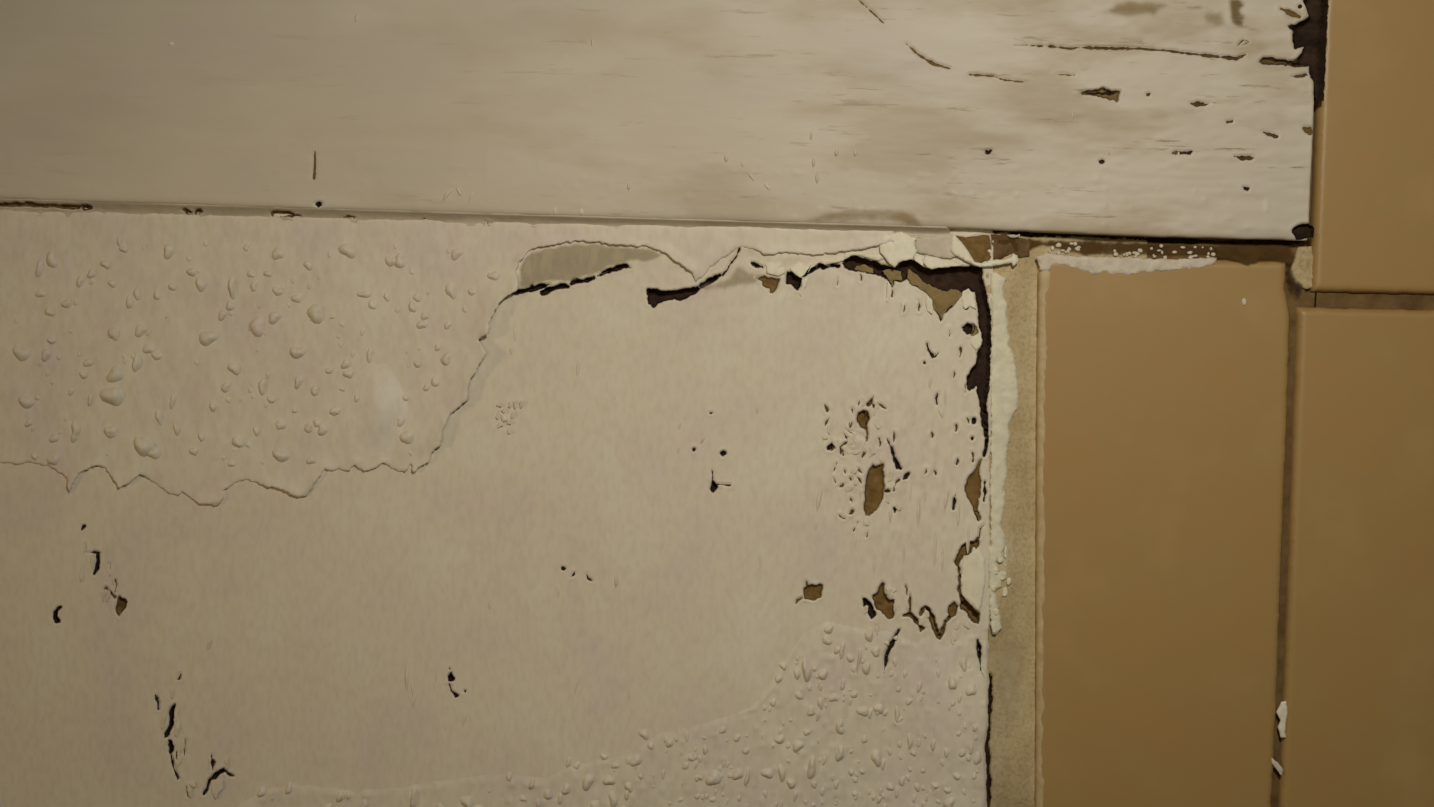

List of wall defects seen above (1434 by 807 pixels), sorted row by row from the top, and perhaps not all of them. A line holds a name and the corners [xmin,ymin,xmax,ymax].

spalling [1280,0,1329,101]
peeling [1081,88,1120,102]
spalling [1292,224,1314,240]
peeling [521,245,658,286]
peeling [720,232,1030,310]
peeling [925,295,933,314]
peeling [962,289,982,350]
peeling [822,397,902,526]
spalling [965,458,987,520]
spalling [795,581,823,604]
spalling [863,582,929,636]
peeling [950,549,986,645]